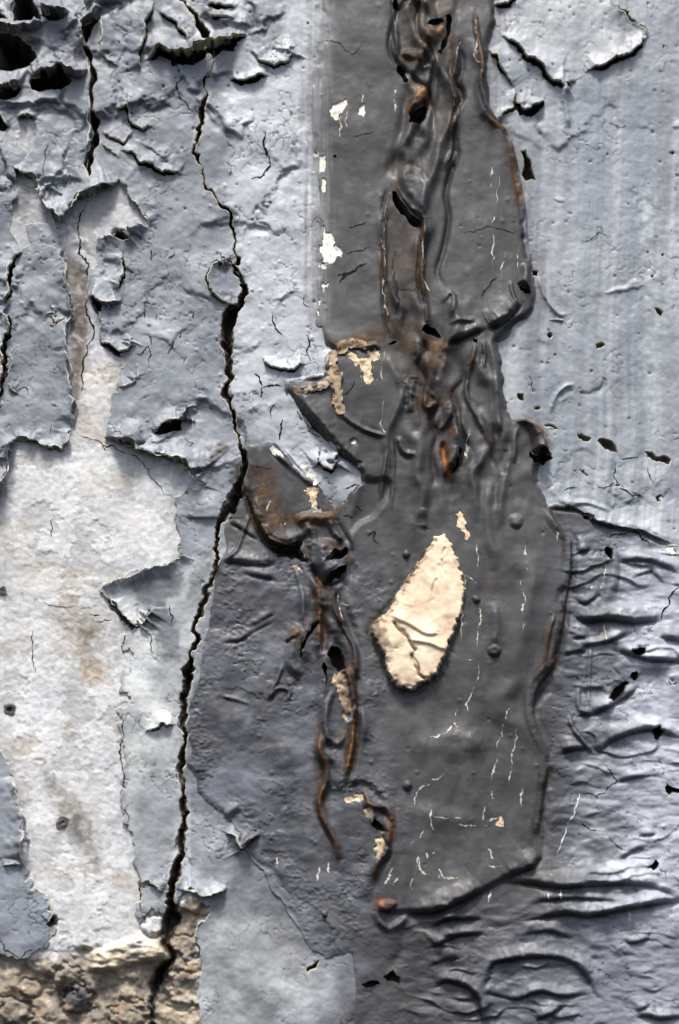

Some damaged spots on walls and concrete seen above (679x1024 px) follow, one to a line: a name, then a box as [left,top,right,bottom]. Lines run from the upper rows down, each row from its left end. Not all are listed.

peeling [330,99,365,120]
corrosion [407,87,428,112]
corrosion [401,17,458,76]
peeling [488,0,664,123]
corrosion [487,116,522,204]
peeling [318,220,343,269]
peeling [263,338,381,414]
corrosion [429,418,454,477]
peeling [0,0,306,1024]
crack [44,0,286,1024]
spalling [371,510,470,691]
corrosion [308,539,357,774]